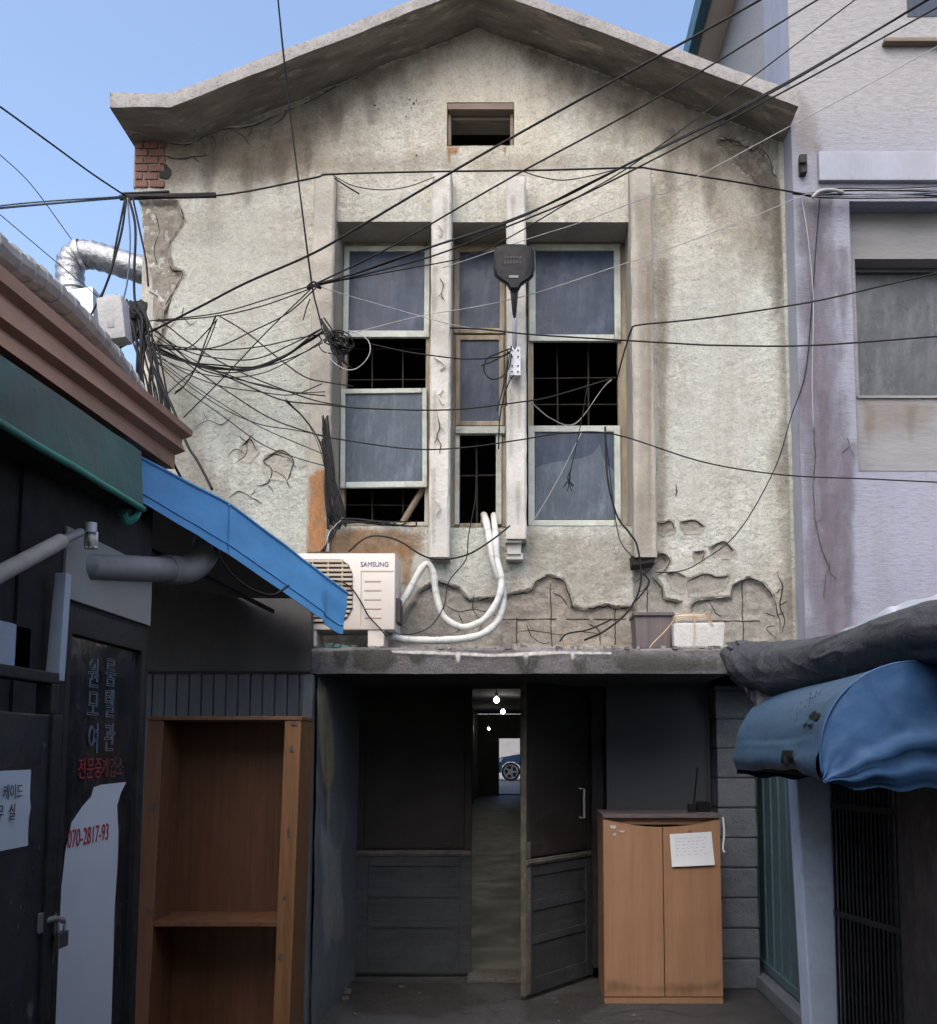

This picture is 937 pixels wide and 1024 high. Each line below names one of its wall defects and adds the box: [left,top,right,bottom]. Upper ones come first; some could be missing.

spalling [133,141,186,342]
peeling [237,437,295,482]
rust [307,470,419,584]
peeling [657,519,706,536]
spalling [370,541,784,651]